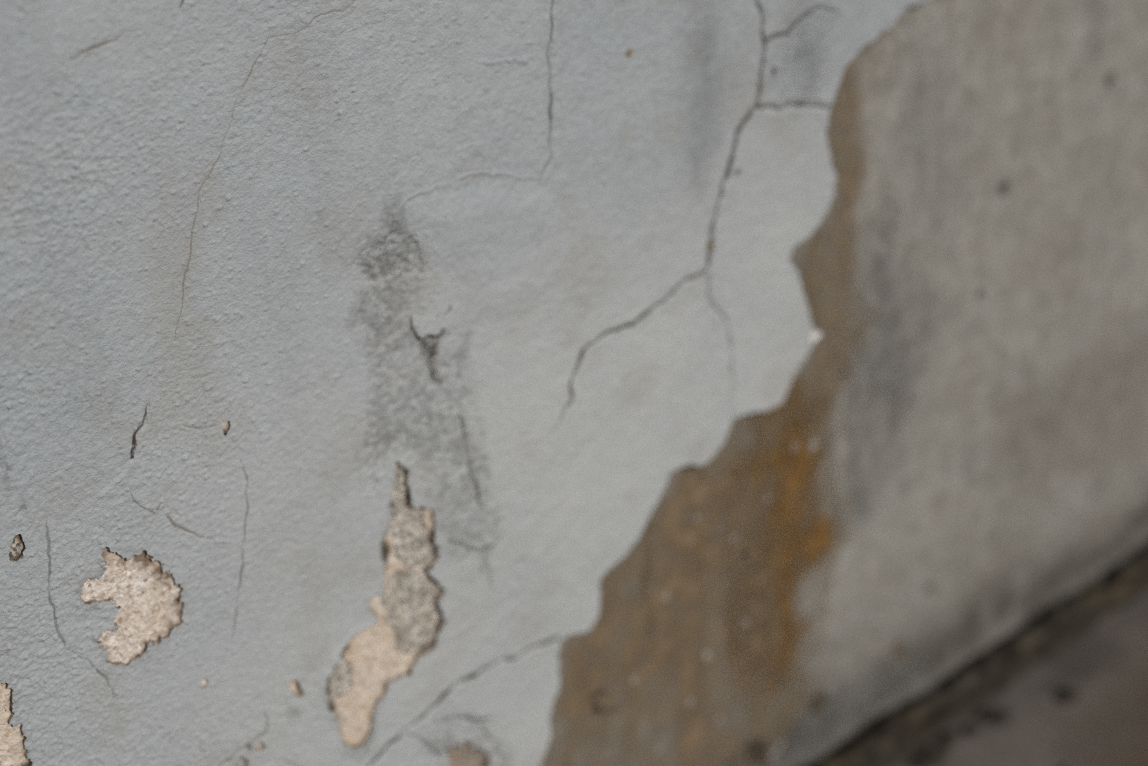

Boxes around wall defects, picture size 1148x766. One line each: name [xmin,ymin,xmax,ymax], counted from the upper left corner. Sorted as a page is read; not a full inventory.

crack [561,2,837,419]
peeling [411,304,457,339]
spalling [541,0,1148,766]
crack [92,407,147,502]
peeling [80,547,184,666]
peeling [326,461,446,749]
water stain [559,397,828,766]
peeling [0,683,33,766]
crack [371,636,560,763]
peeling [446,740,491,766]